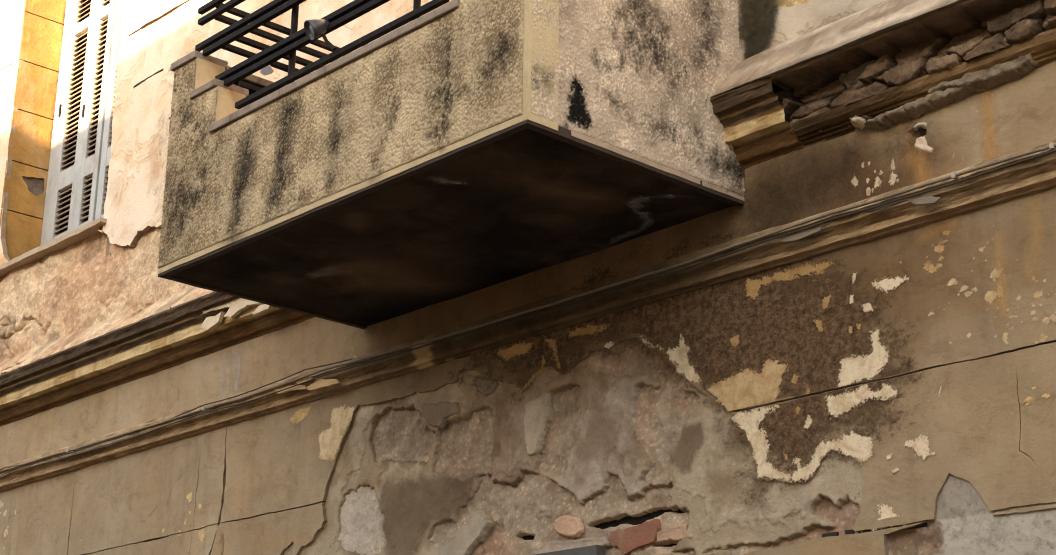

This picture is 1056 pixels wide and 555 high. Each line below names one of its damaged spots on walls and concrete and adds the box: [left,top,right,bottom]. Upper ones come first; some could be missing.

water stain [482,34,514,78]
water stain [614,0,679,88]
water stain [564,76,592,129]
water stain [165,164,206,244]
water stain [228,128,256,240]
water stain [269,103,295,212]
peeling [779,226,823,242]
peeling [851,158,942,213]
spalling [0,227,213,375]
peeling [201,298,273,330]
peeling [274,376,340,394]
spalling [284,247,1056,555]